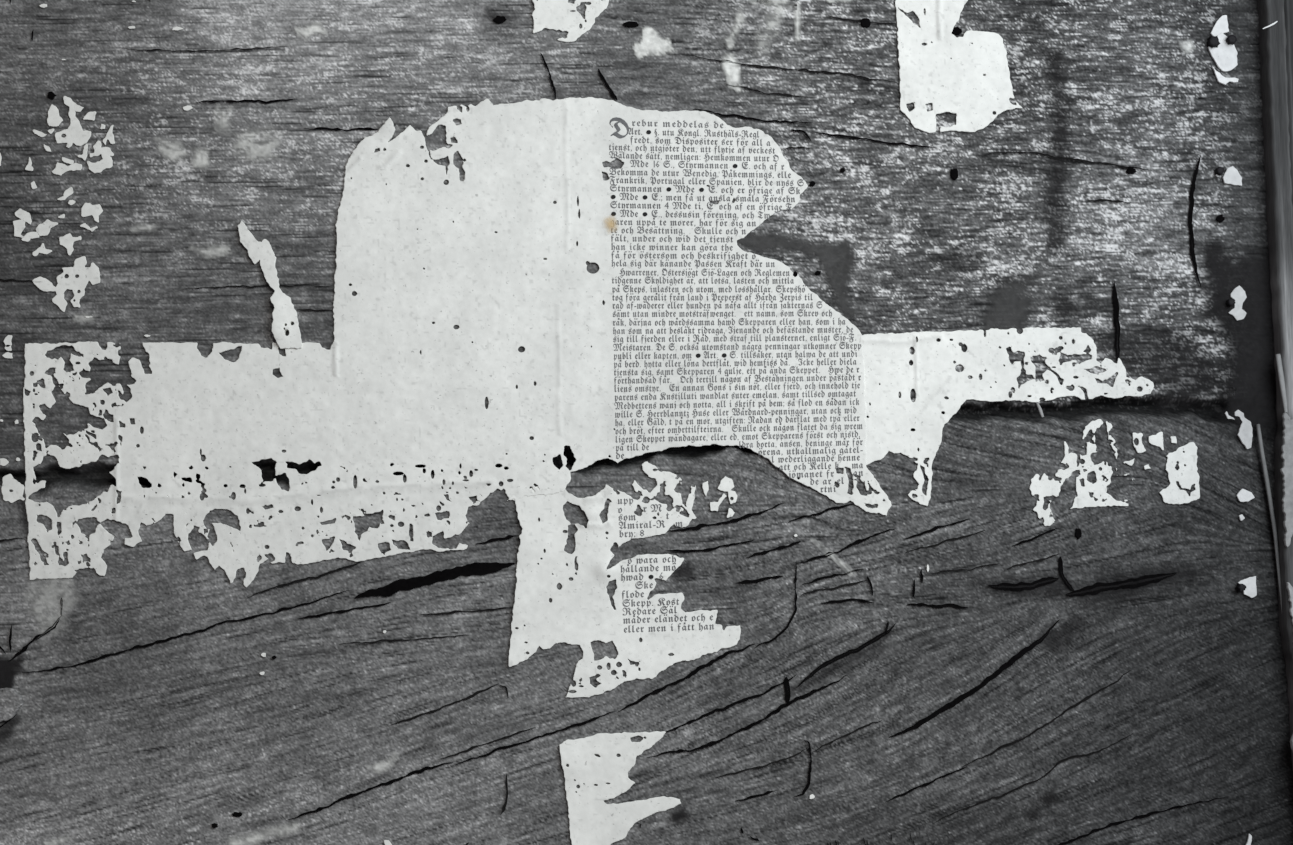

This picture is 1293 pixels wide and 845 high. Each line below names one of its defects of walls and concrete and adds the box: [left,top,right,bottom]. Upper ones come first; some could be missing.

peeling [13,104,115,256]
peeling [737,233,856,318]
peeling [986,279,1030,330]
crack [1188,155,1201,287]
crack [0,535,519,673]
crack [286,503,1177,845]
crack [1058,797,1226,845]